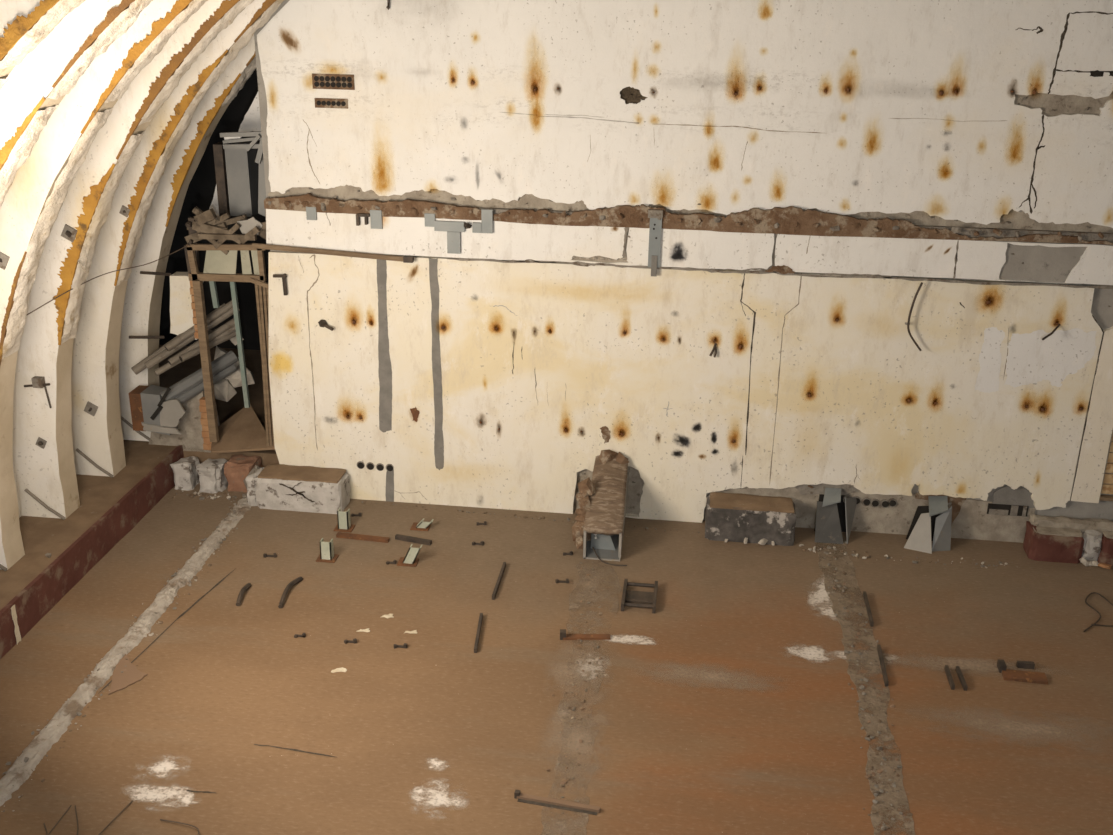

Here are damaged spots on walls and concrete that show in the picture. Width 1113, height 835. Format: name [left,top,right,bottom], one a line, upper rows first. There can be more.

crack [1016,11,1113,214]
spalling [268,185,607,211]
spalling [649,203,727,217]
corrosion [264,193,1113,245]
spalling [802,208,1113,233]
spalling [999,243,1087,283]
spalling [1091,288,1113,330]
spalling [992,485,1035,508]
spalling [1079,430,1113,567]